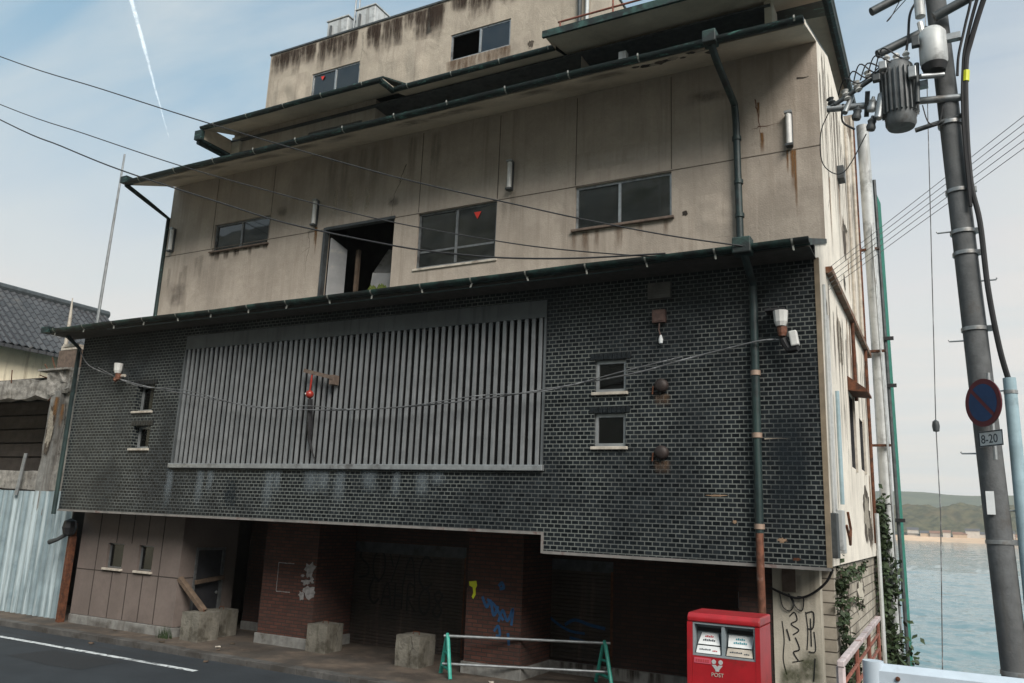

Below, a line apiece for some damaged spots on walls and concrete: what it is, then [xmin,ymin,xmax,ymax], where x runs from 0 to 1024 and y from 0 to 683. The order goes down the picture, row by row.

leakage [272,0,491,68]
corrosion [787,150,797,192]
spalling [43,398,55,455]
peeling [298,562,316,600]